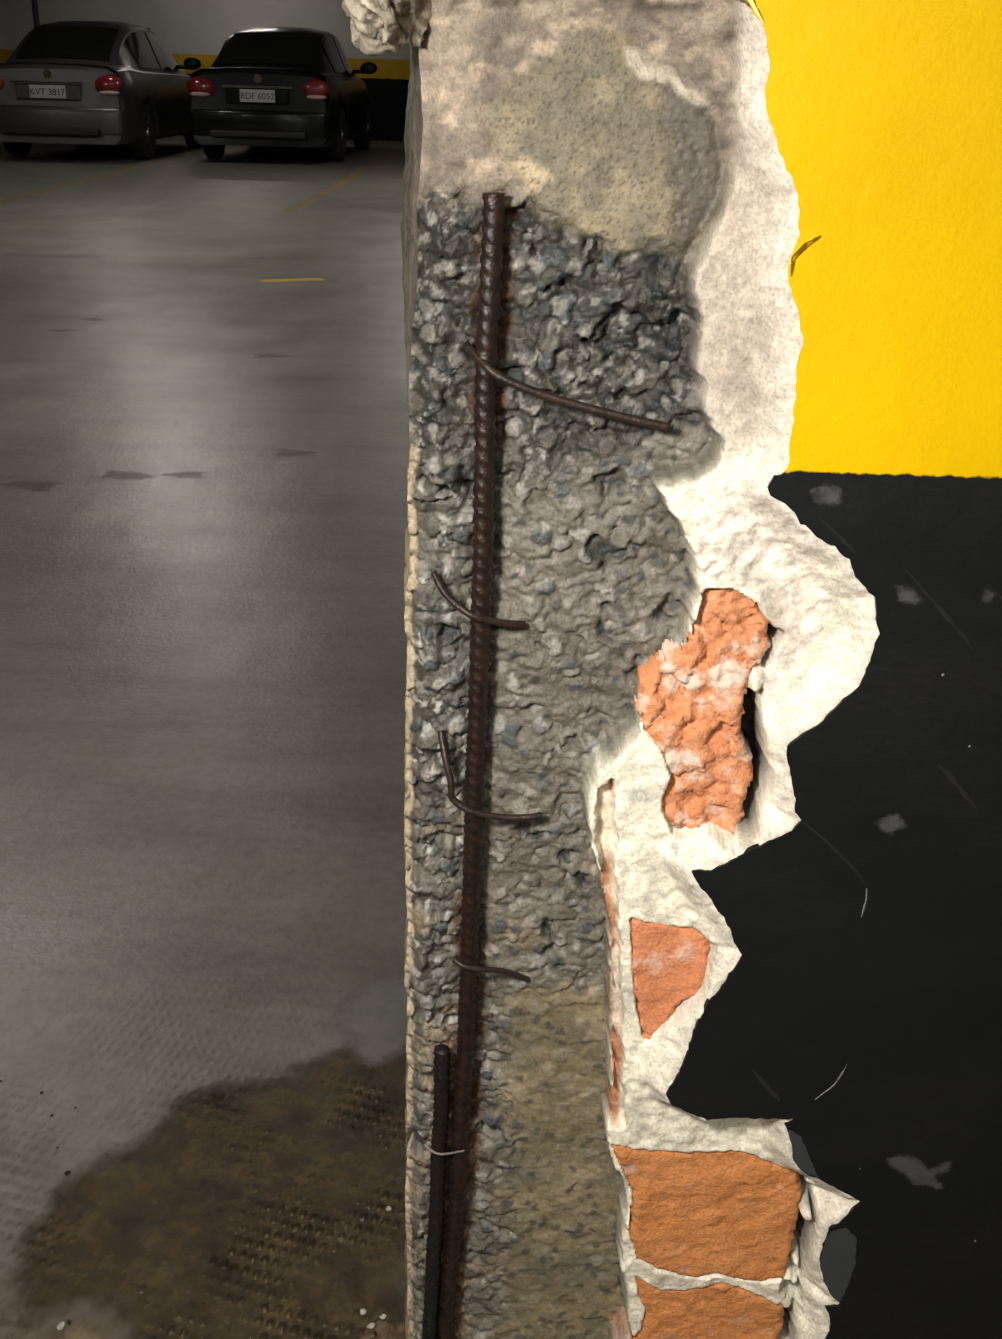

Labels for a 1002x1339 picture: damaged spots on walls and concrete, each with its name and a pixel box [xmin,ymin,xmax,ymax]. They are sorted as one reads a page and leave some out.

rust [495,365,506,417]
spalling [341,0,880,1339]
water stain [15,971,408,1339]